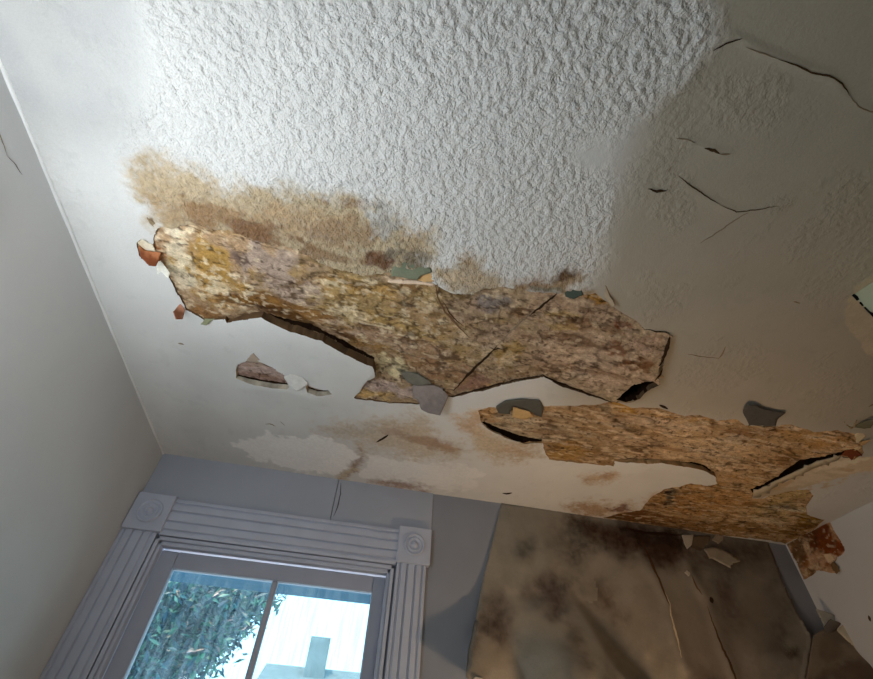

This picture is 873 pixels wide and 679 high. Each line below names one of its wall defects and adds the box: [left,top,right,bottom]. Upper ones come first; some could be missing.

crack [713,38,873,113]
crack [677,138,730,155]
water stain [109,140,604,299]
crack [649,167,775,243]
peeling [137,218,873,544]
water stain [293,401,553,494]
water stain [551,466,686,567]